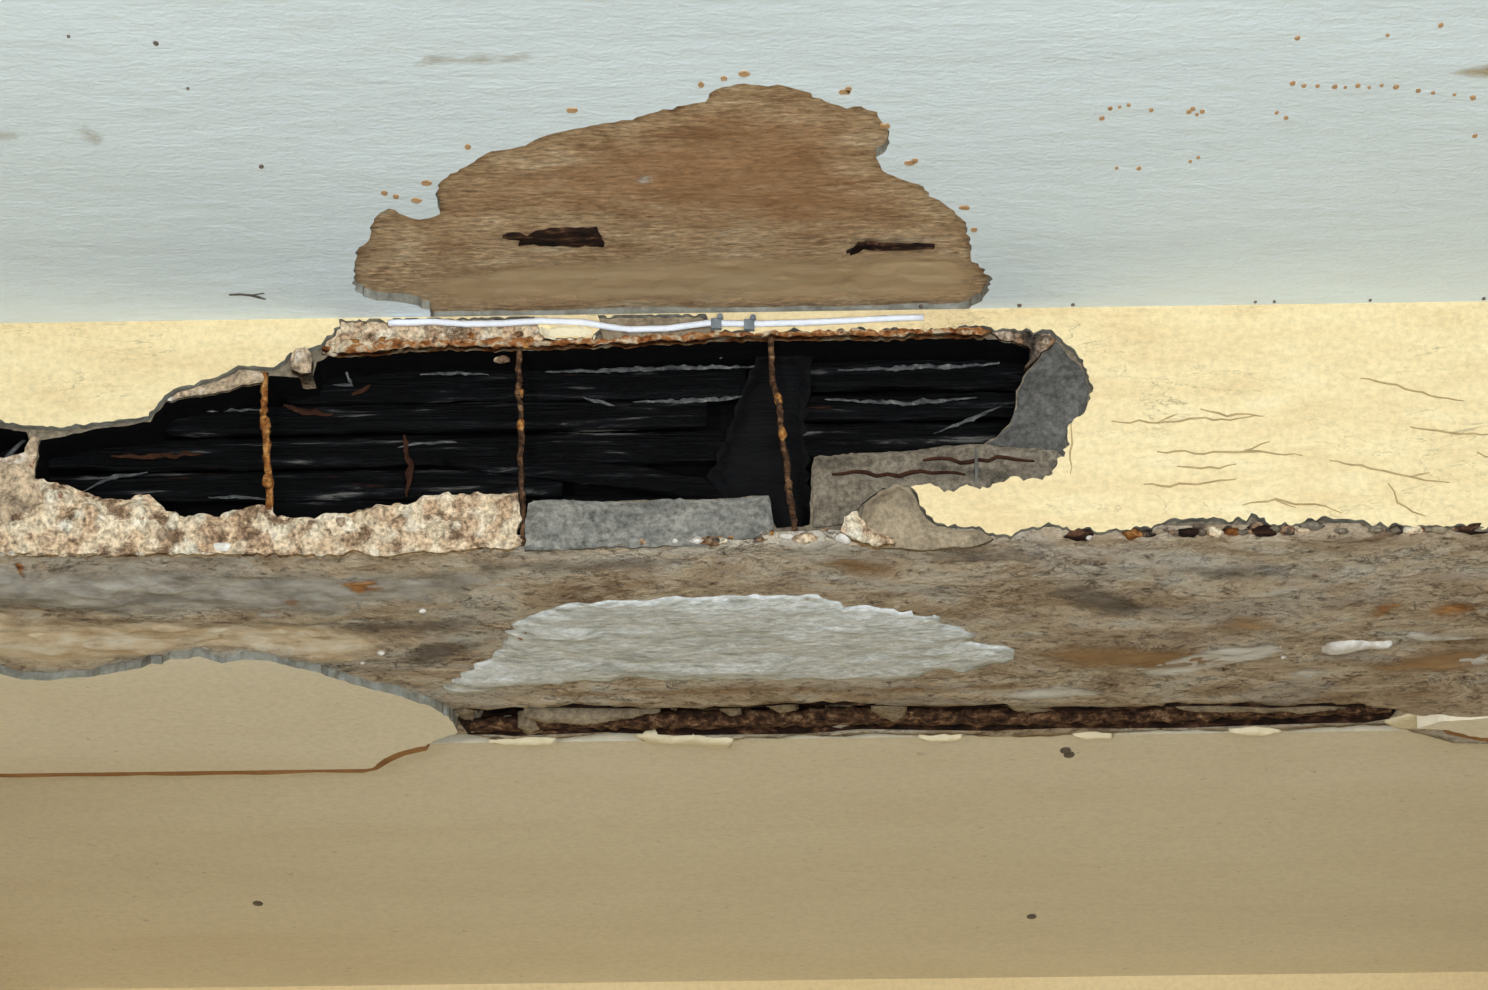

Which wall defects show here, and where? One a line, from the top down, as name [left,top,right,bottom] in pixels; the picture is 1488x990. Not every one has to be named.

peeling [354,70,989,312]
rust [321,326,992,358]
crack [1067,423,1075,474]
crack [1112,409,1450,516]
crack [1360,378,1488,458]
spalling [0,331,1488,744]